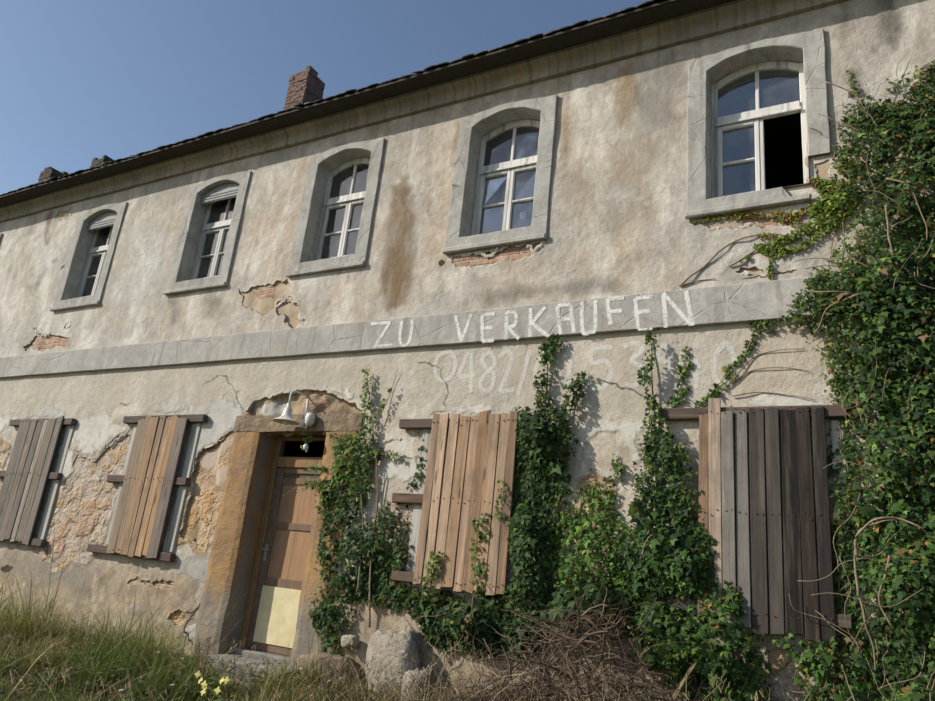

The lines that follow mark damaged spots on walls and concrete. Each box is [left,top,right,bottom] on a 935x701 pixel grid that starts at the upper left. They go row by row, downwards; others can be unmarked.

spalling [450,240,548,270]
spalling [237,277,305,329]
spalling [22,321,71,353]
crack [190,375,243,476]
spalling [242,387,366,432]
spalling [40,424,134,573]
spalling [176,426,234,555]
spalling [166,607,188,628]